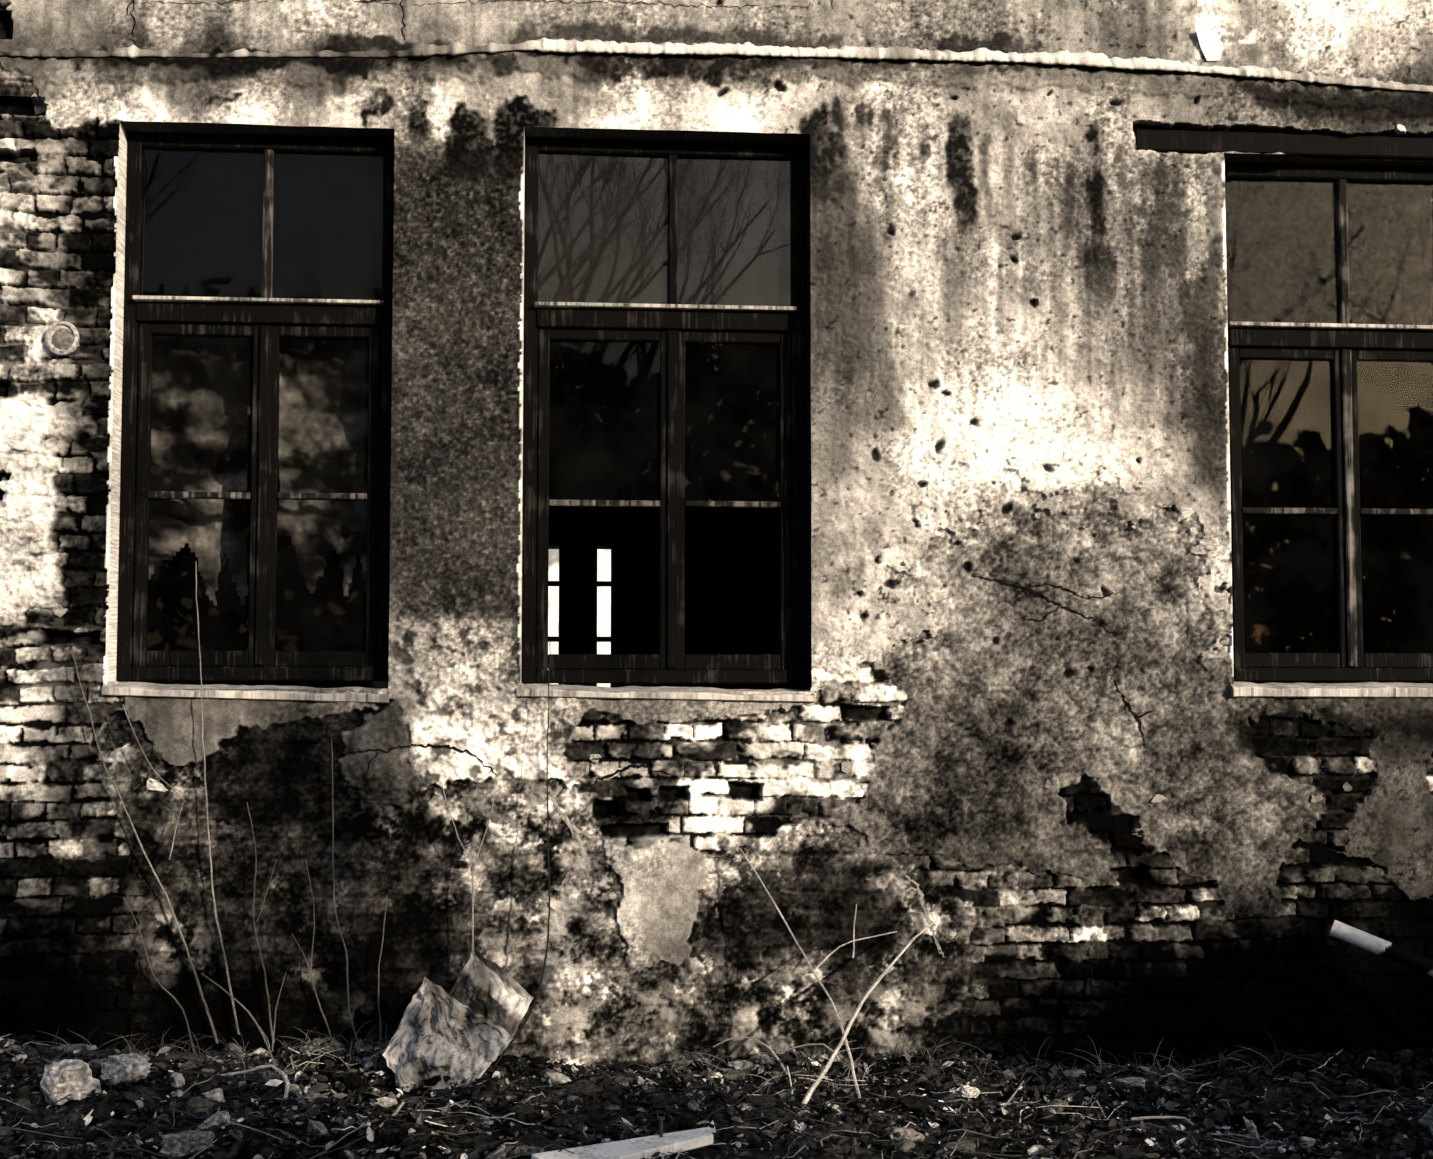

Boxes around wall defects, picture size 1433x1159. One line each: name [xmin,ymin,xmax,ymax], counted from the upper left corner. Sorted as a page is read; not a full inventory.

spalling [0,0,13,39]
crack [125,0,283,46]
crack [352,0,833,40]
spalling [1133,120,1433,138]
leakage [920,113,991,231]
leakage [1026,160,1038,183]
leakage [799,96,898,321]
leakage [1063,123,1229,455]
flaking render [925,377,951,396]
flaking render [935,436,946,456]
flaking render [0,62,155,1051]
flaking render [562,460,1433,1069]